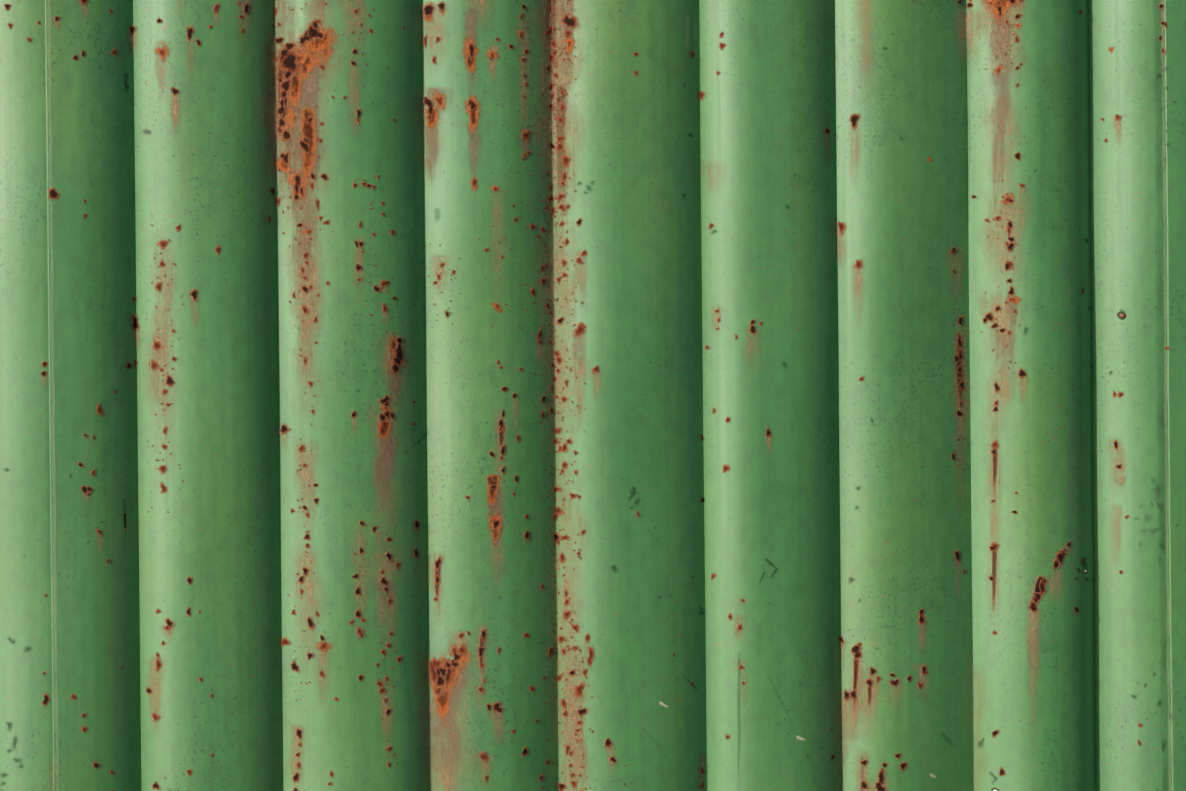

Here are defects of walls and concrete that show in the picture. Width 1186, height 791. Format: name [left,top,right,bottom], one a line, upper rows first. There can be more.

rust [423,2,445,64]
rust [127,224,180,415]
rust [268,0,374,425]
rust [377,334,404,496]
rust [463,0,599,791]
rust [983,184,1025,351]
rust [352,520,402,726]
rust [428,629,515,791]
rust [839,636,927,729]
rust [860,753,907,791]
rust [989,440,1000,605]
rust [1029,541,1071,655]